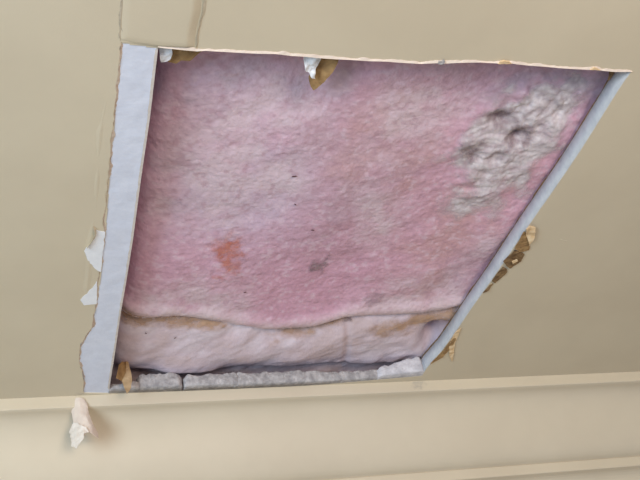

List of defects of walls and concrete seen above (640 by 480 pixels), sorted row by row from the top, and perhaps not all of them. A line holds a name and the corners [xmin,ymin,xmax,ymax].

peeling [79,42,424,393]
peeling [69,397,99,449]